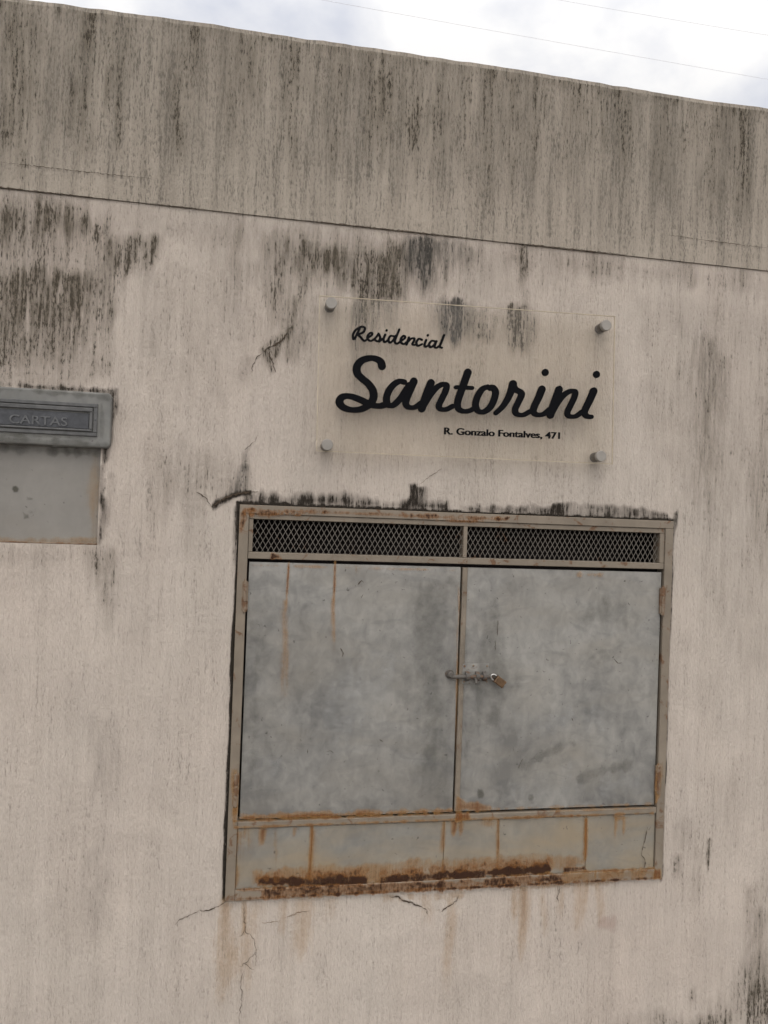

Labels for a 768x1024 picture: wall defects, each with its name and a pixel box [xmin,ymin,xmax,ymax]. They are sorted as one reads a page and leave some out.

damp [70,13,117,115]
damp [401,84,449,152]
damp [461,69,545,172]
damp [709,107,749,221]
damp [0,198,157,420]
crack [252,325,292,373]
damp [262,236,454,372]
damp [437,296,537,350]
damp [212,460,678,900]
rust [233,799,661,900]
crack [389,892,457,913]
crack [175,902,308,1024]